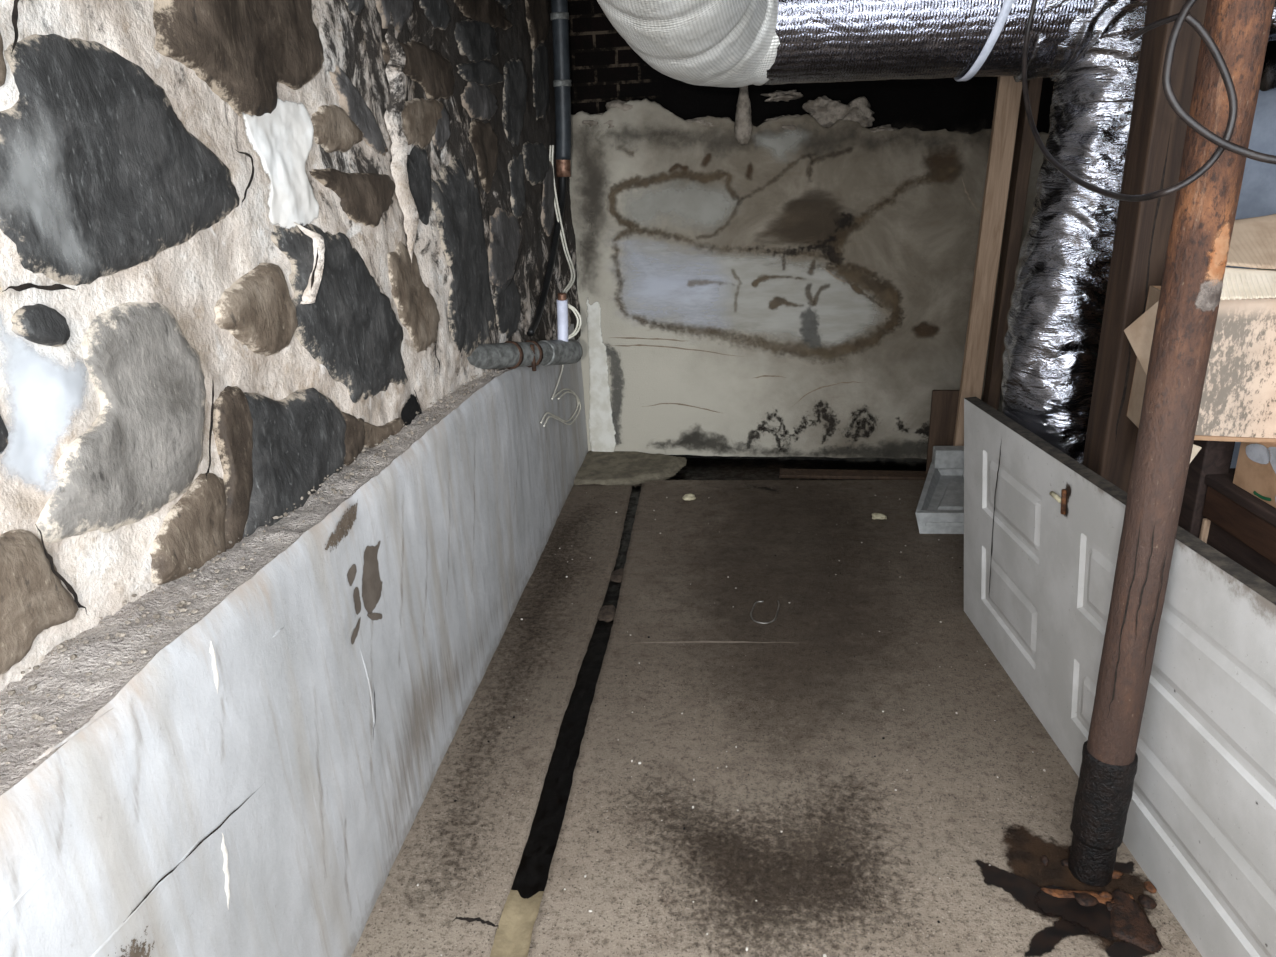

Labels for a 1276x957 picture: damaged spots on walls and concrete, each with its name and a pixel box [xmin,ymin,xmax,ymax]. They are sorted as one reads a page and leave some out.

damp [579,131,962,360]
damp [656,400,929,462]
peeling [325,499,358,550]
crack [128,791,256,917]
damp [628,787,894,955]
corrosion [975,824,1152,957]